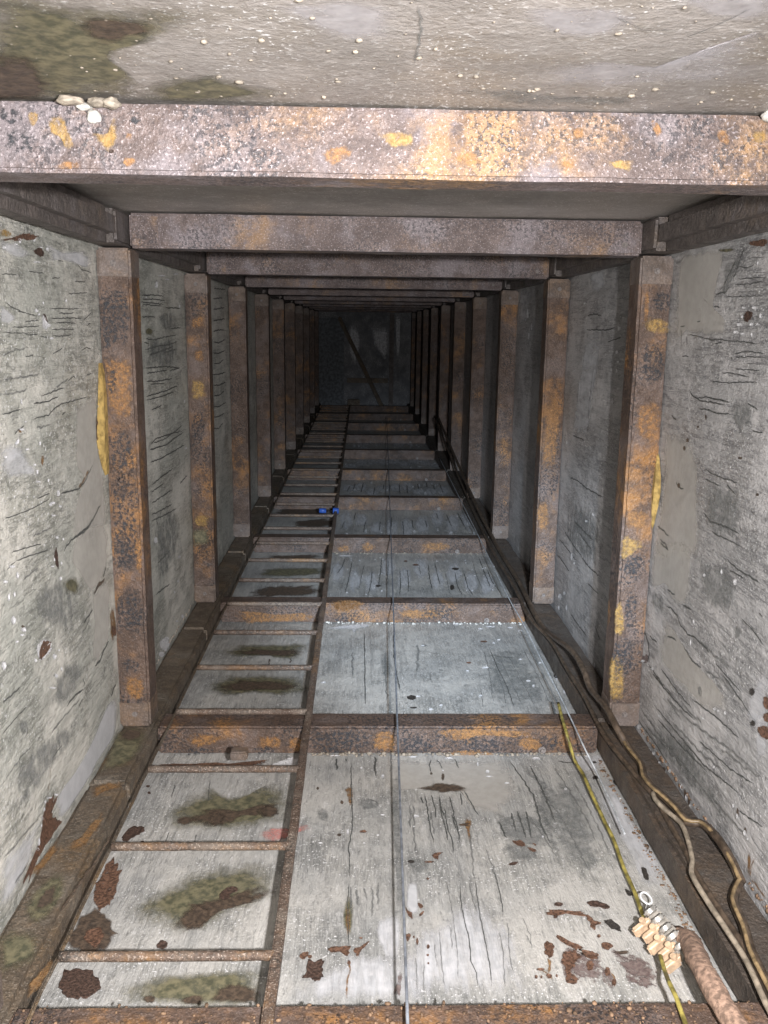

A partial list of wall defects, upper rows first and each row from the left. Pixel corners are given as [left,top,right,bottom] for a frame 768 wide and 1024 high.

water stain [0,1,159,99]
rust [1,108,40,152]
crack [2,260,91,445]
crack [672,321,764,450]
crack [6,450,100,579]
crack [703,513,758,585]
rust [610,592,637,698]
crack [641,590,750,718]
spalling [23,776,62,884]
rust [61,826,145,951]
rust [162,731,479,875]
rust [344,900,352,930]